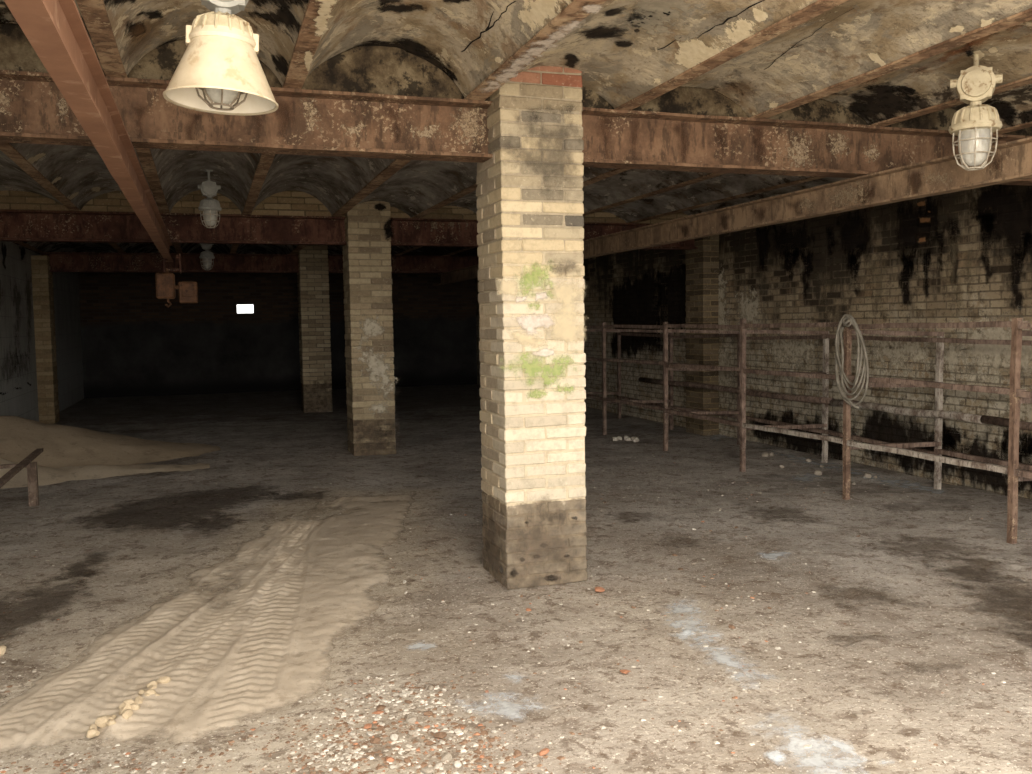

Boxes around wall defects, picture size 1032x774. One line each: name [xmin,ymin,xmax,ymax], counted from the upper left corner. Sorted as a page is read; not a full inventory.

peeling [303,51,314,71]
peeling [313,0,338,37]
crack [461,1,516,52]
flaking render [517,0,572,33]
flaking render [625,0,768,69]
flaking render [867,53,886,66]
flaking render [963,45,998,60]
leakage [783,250,813,296]
leakage [898,219,960,305]
leakage [977,212,994,284]
leakage [1011,233,1032,311]